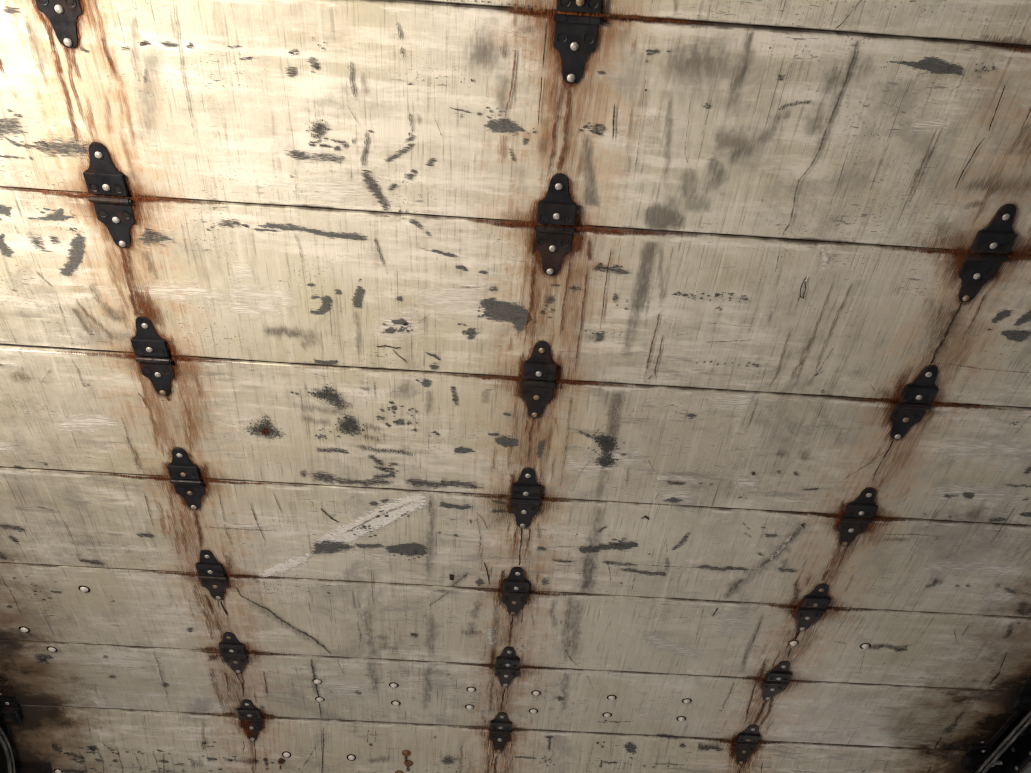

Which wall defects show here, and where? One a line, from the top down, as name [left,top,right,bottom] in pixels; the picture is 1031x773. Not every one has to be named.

corrosion [985,37,1031,53]
corrosion [7,0,295,773]
corrosion [438,0,699,546]
corrosion [846,365,1024,465]
corrosion [893,233,1031,344]
corrosion [449,567,598,773]
corrosion [691,485,912,773]